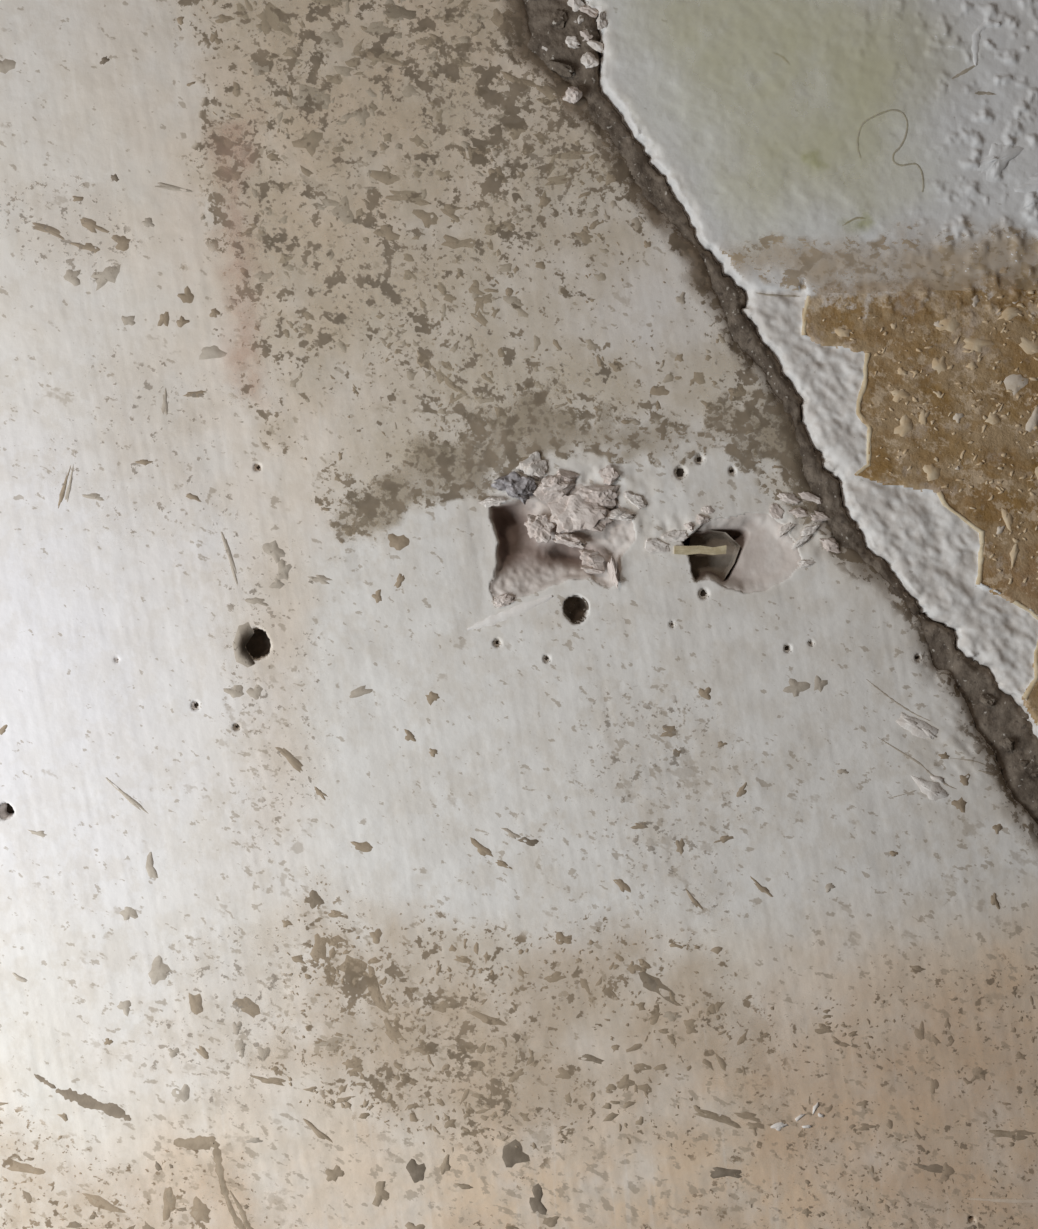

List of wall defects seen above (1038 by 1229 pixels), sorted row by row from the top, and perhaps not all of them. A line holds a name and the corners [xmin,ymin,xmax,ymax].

leakage [7,181,131,291]
leakage [121,316,135,326]
leakage [155,0,814,550]
leakage [58,465,120,517]
leakage [130,381,171,442]
spalling [477,451,841,608]
peeling [801,267,1038,620]
leakage [221,532,332,628]
peeling [1022,641,1038,725]